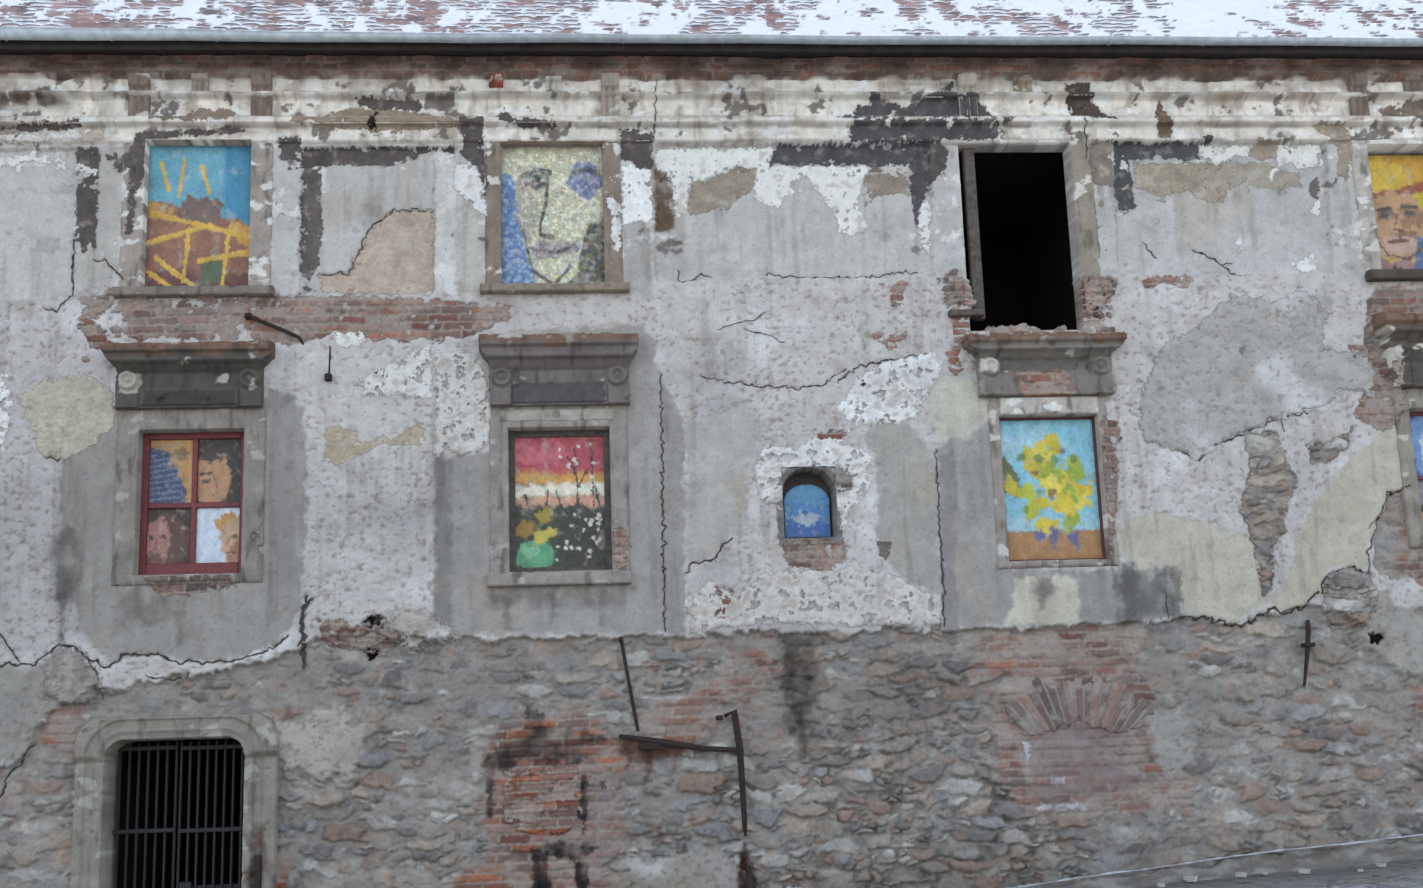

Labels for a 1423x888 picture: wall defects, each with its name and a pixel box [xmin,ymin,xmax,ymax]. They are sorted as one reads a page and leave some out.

peeling [606,81,1014,254]
flaking render [0,94,557,465]
flaking render [1142,274,1191,289]
peeling [1291,253,1318,273]
peeling [754,331,964,571]
flaking render [1100,415,1122,559]
spalling [1136,291,1410,596]
crack [0,595,313,700]
flaking render [714,586,734,621]
crack [0,745,35,797]
damp [532,852,552,888]
damp [575,862,590,888]